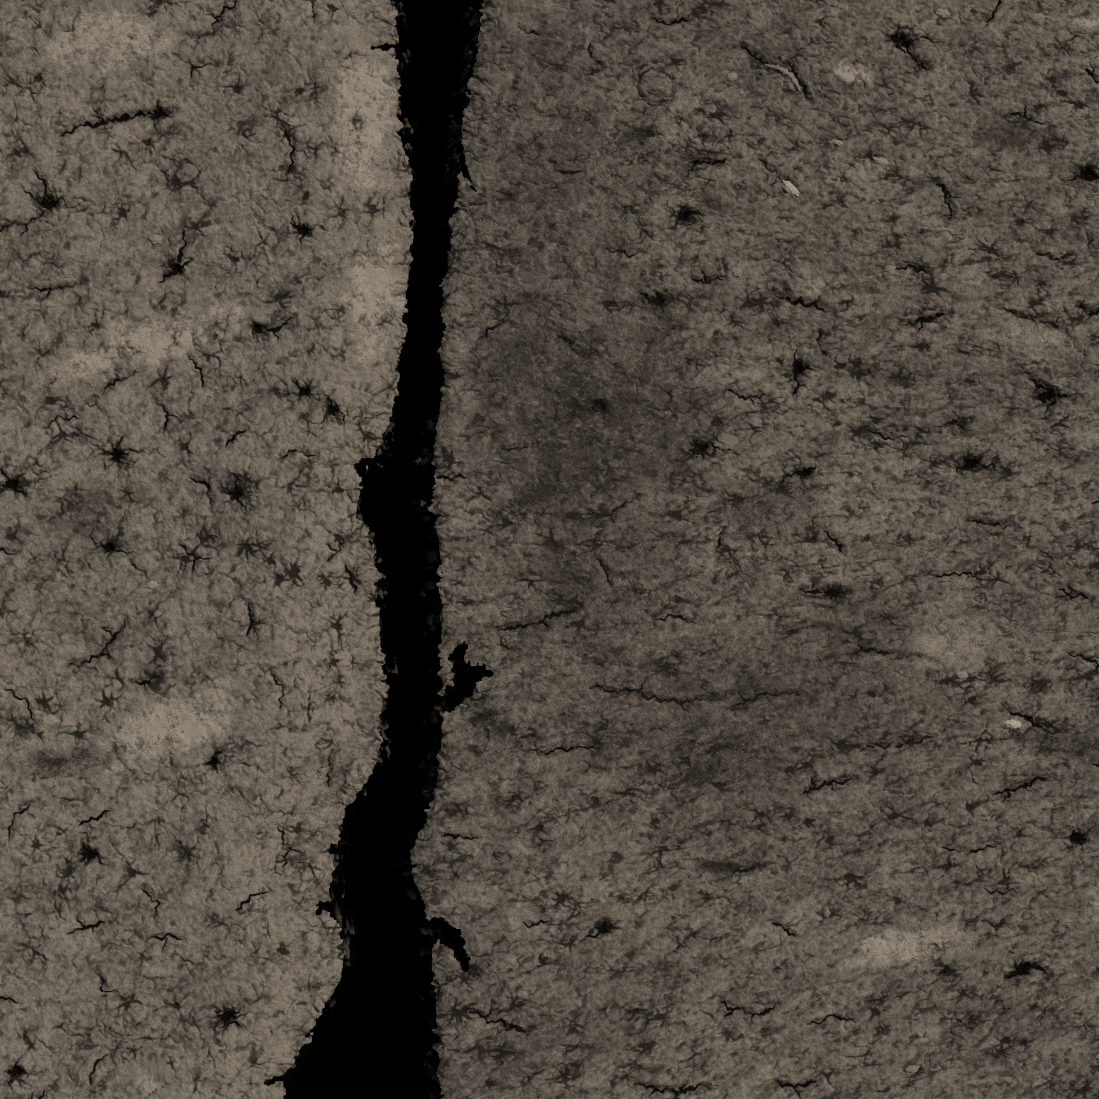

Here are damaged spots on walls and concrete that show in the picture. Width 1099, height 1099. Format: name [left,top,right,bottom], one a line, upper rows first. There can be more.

crack [62,107,174,136]
crack [475,323,502,350]
crack [264,0,493,1099]
crack [246,603,255,636]
crack [235,892,267,911]